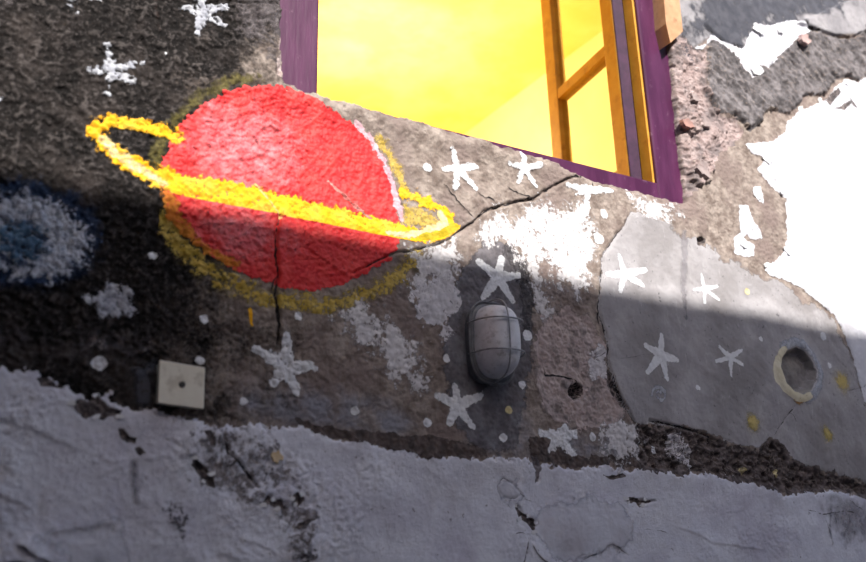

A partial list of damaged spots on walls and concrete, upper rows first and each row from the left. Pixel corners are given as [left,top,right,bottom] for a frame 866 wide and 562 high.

crack [271,220,281,341]
crack [355,174,593,272]
peeling [625,189,685,224]
peeling [666,20,866,402]
spalling [475,199,866,499]
spalling [190,419,319,562]
spalling [623,497,651,507]